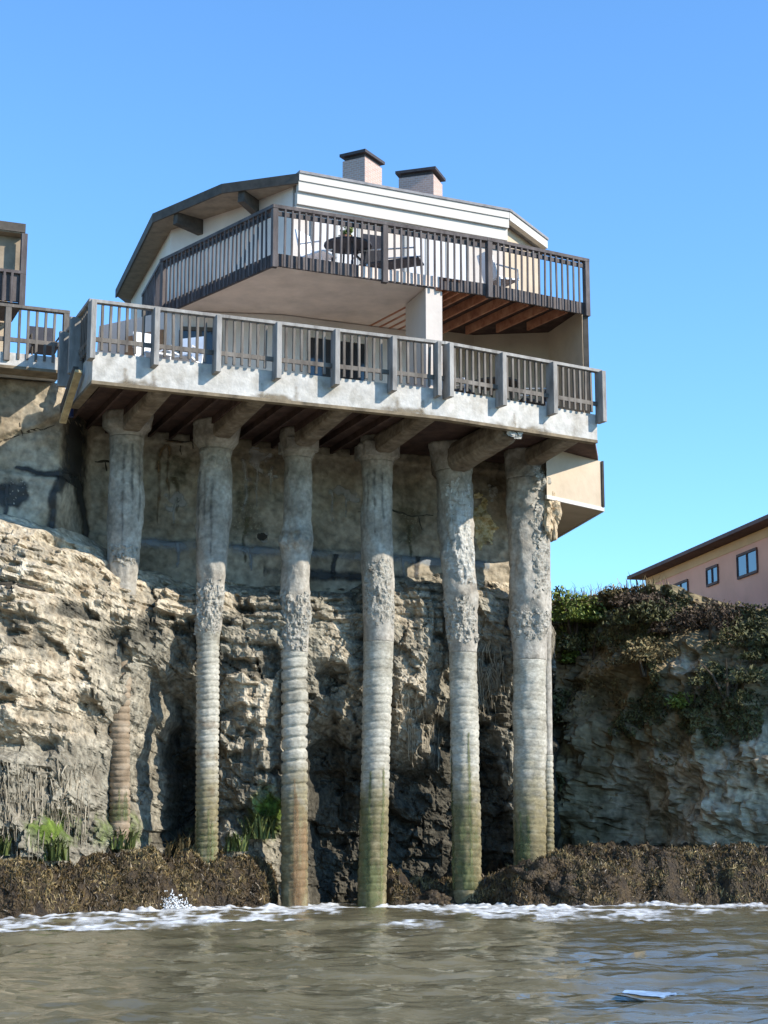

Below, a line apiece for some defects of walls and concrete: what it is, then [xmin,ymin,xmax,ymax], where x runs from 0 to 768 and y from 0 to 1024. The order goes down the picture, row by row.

spalling [194,578,226,636]
spalling [279,589,312,651]
spalling [363,556,395,628]
spalling [442,477,499,644]
spalling [510,466,562,643]